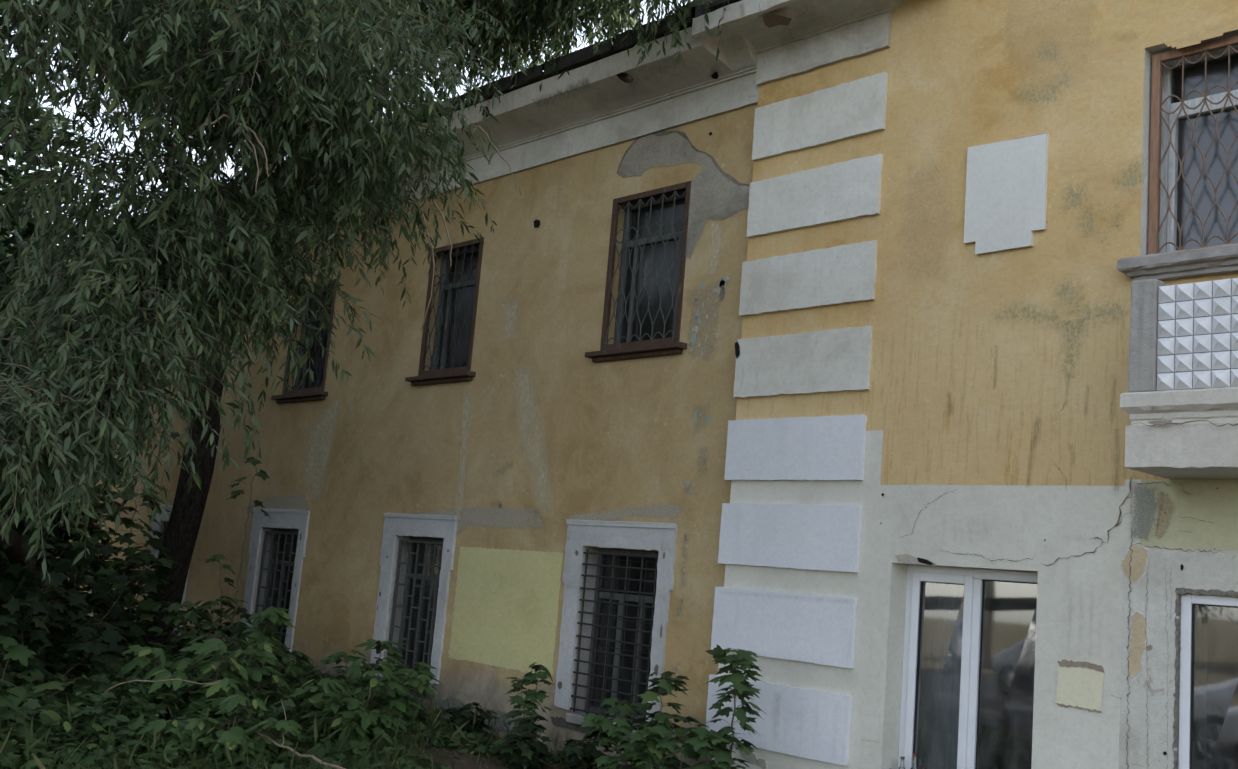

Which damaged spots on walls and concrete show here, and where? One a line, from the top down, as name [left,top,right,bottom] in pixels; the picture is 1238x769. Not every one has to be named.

flaking render [617,132,750,260]
crack [1129,419,1238,427]
peeling [1120,492,1173,585]
crack [948,472,1222,769]
peeling [1126,610,1149,680]